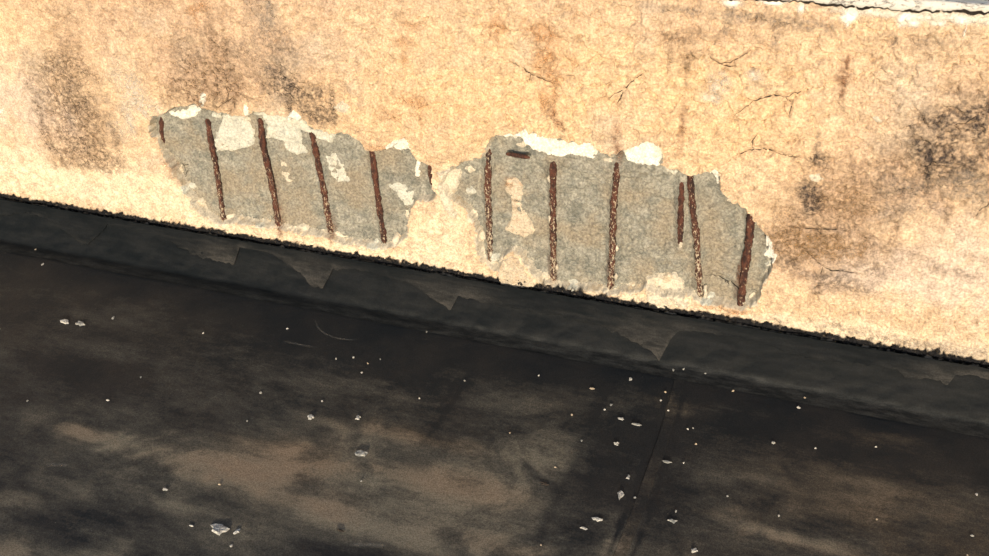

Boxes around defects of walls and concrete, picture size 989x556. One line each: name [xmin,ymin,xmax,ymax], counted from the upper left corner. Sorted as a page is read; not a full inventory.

corrosion [205,119,227,221]
corrosion [257,118,282,227]
corrosion [309,132,334,234]
corrosion [369,151,387,243]
spalling [148,92,777,311]
corrosion [484,149,493,262]
corrosion [547,161,559,281]
corrosion [607,146,620,290]
corrosion [677,176,708,298]
corrosion [733,214,755,314]
damp [800,185,821,212]
damp [915,100,989,181]